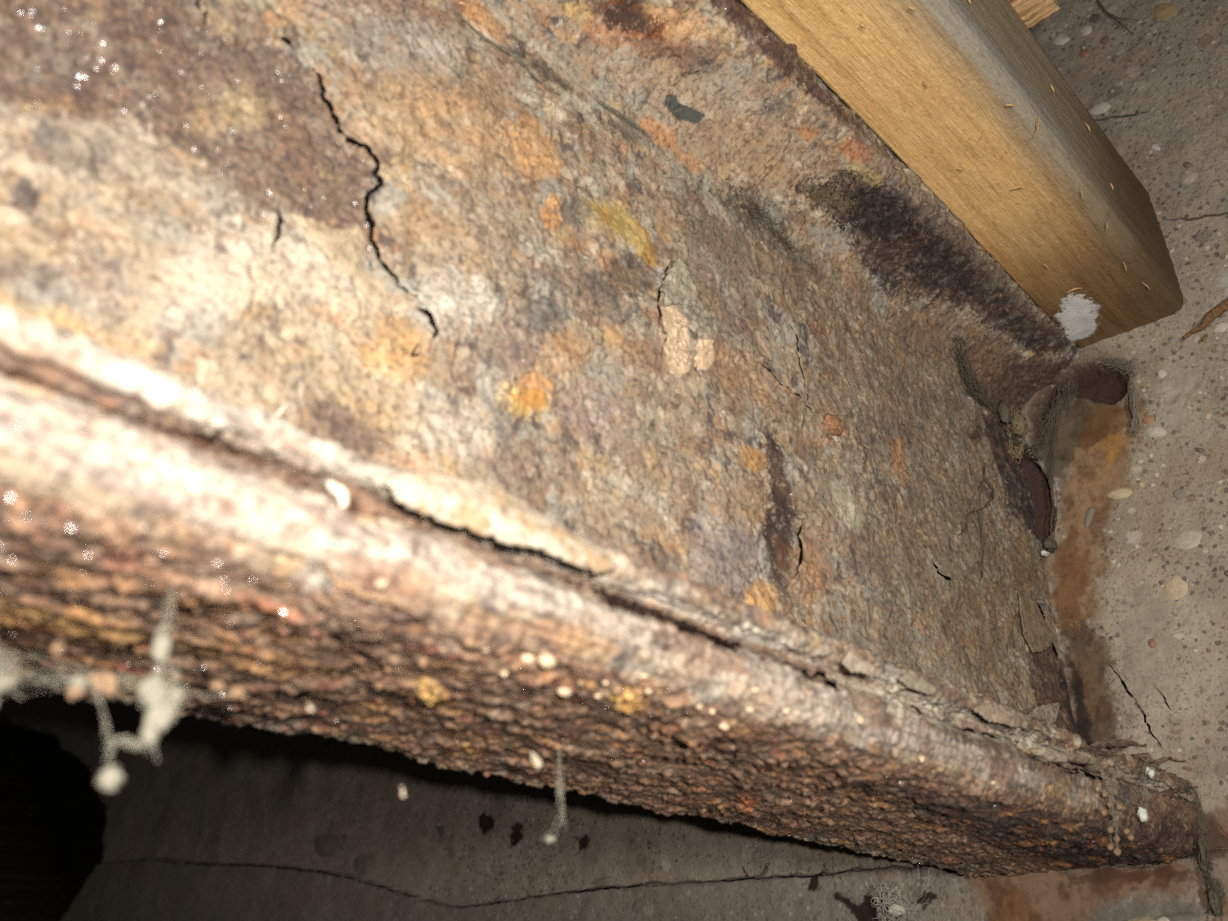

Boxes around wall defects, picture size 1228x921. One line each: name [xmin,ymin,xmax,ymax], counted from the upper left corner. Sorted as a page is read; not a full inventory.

crack [273,210,284,247]
crack [312,67,439,357]
corrosion [588,201,698,310]
corrosion [0,368,843,691]
corrosion [1044,402,1144,745]
corrosion [842,651,876,677]
corrosion [898,672,1060,738]
corrosion [530,751,543,769]
corrosion [1028,755,1108,780]
crack [119,859,877,908]
corrosion [967,813,1228,921]